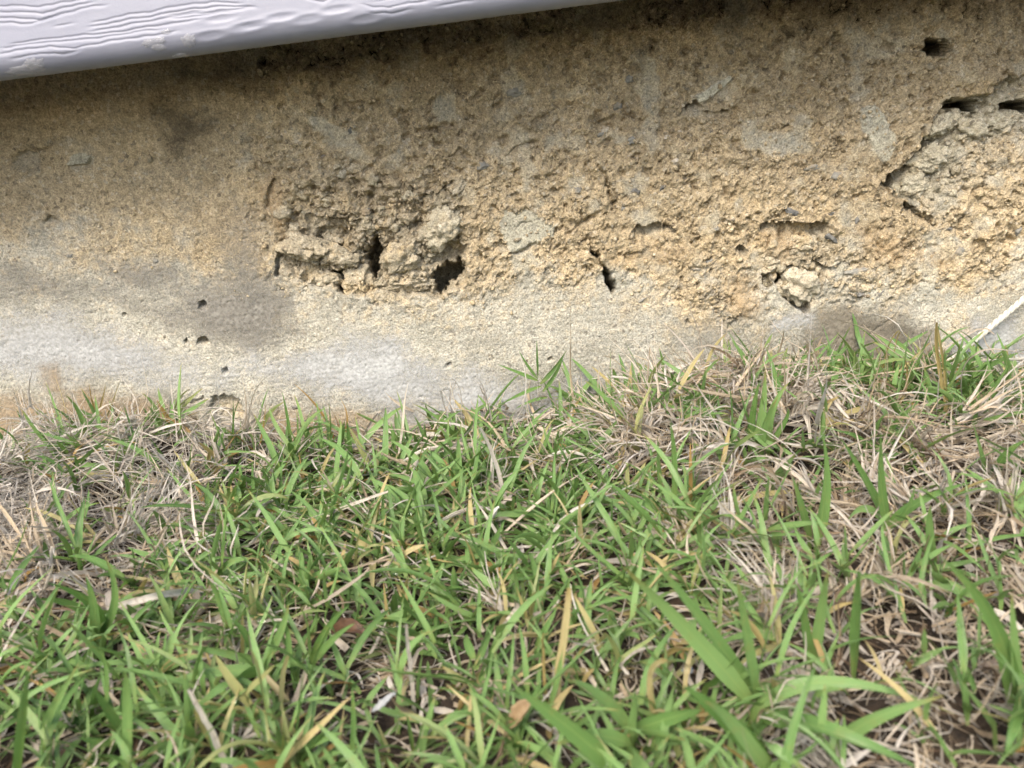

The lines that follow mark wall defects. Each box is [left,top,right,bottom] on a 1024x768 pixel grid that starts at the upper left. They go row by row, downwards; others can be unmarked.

spalling [261,141,485,302]
crack [564,164,617,269]
spalling [858,73,1024,225]
damp [0,313,197,391]
damp [163,285,592,422]